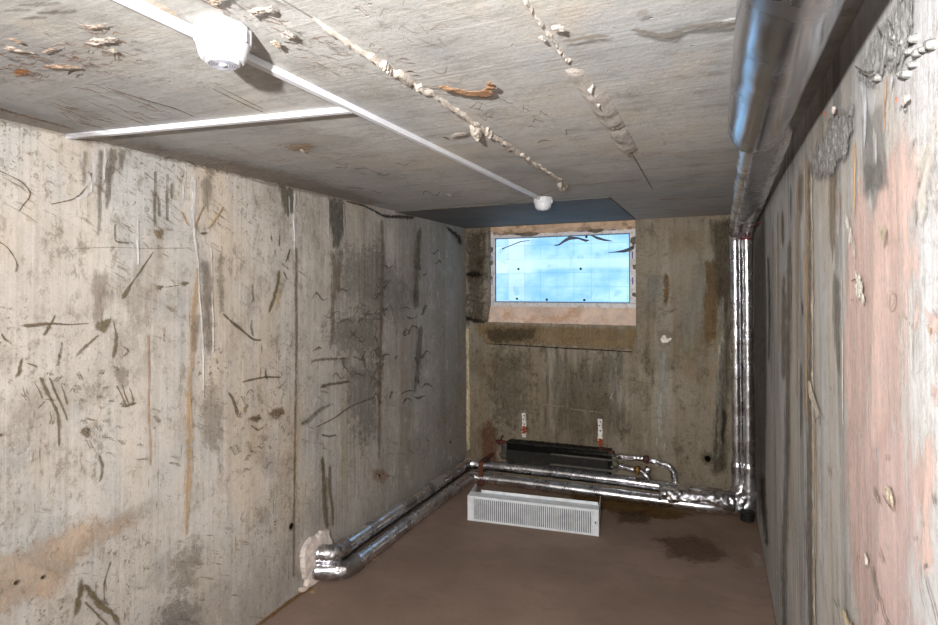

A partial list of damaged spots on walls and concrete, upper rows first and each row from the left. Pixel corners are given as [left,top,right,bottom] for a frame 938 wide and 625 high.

peeling [1,38,81,75]
peeling [78,23,118,61]
peeling [248,5,276,16]
crack [467,98,567,165]
water stain [466,232,636,348]
corrosion [185,269,198,534]
peeling [834,126,937,625]